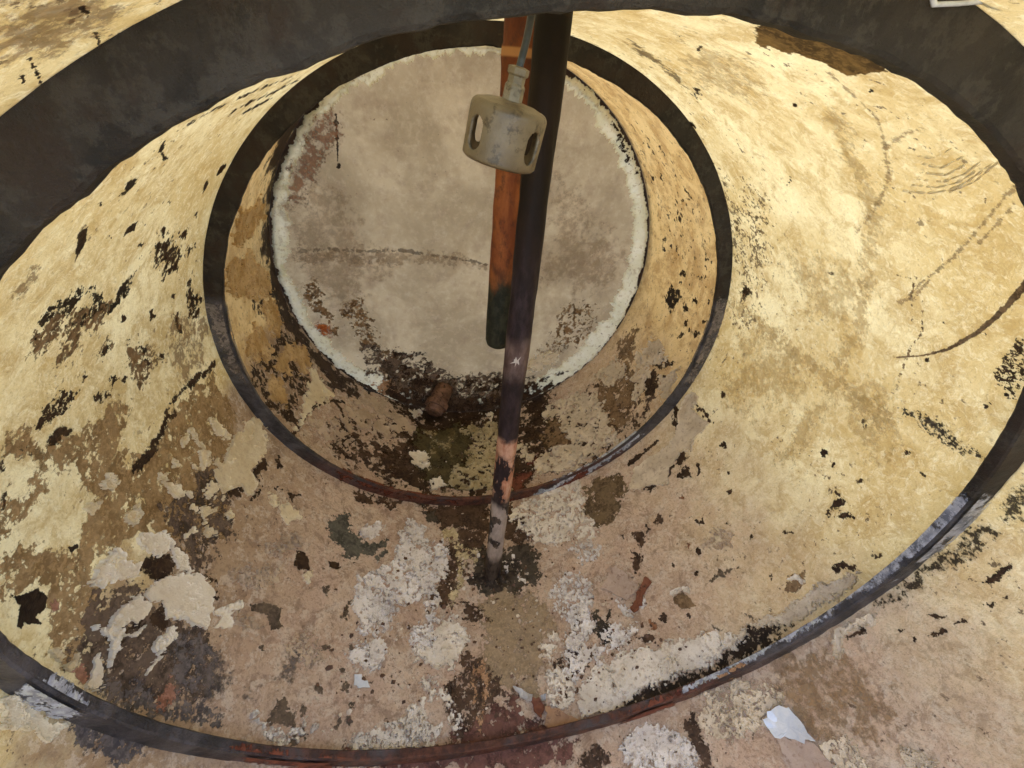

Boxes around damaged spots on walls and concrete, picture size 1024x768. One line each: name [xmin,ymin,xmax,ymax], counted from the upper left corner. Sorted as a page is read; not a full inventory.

spalling [34,275,133,341]
water stain [250,112,674,747]
rust [509,454,542,502]
rust [550,466,589,491]
water stain [669,451,693,479]
peeling [47,417,311,692]
peeling [509,335,862,719]
peeling [343,518,471,750]
rust [71,663,90,685]
rust [227,658,581,768]
rust [619,689,681,725]
peeling [618,721,700,768]